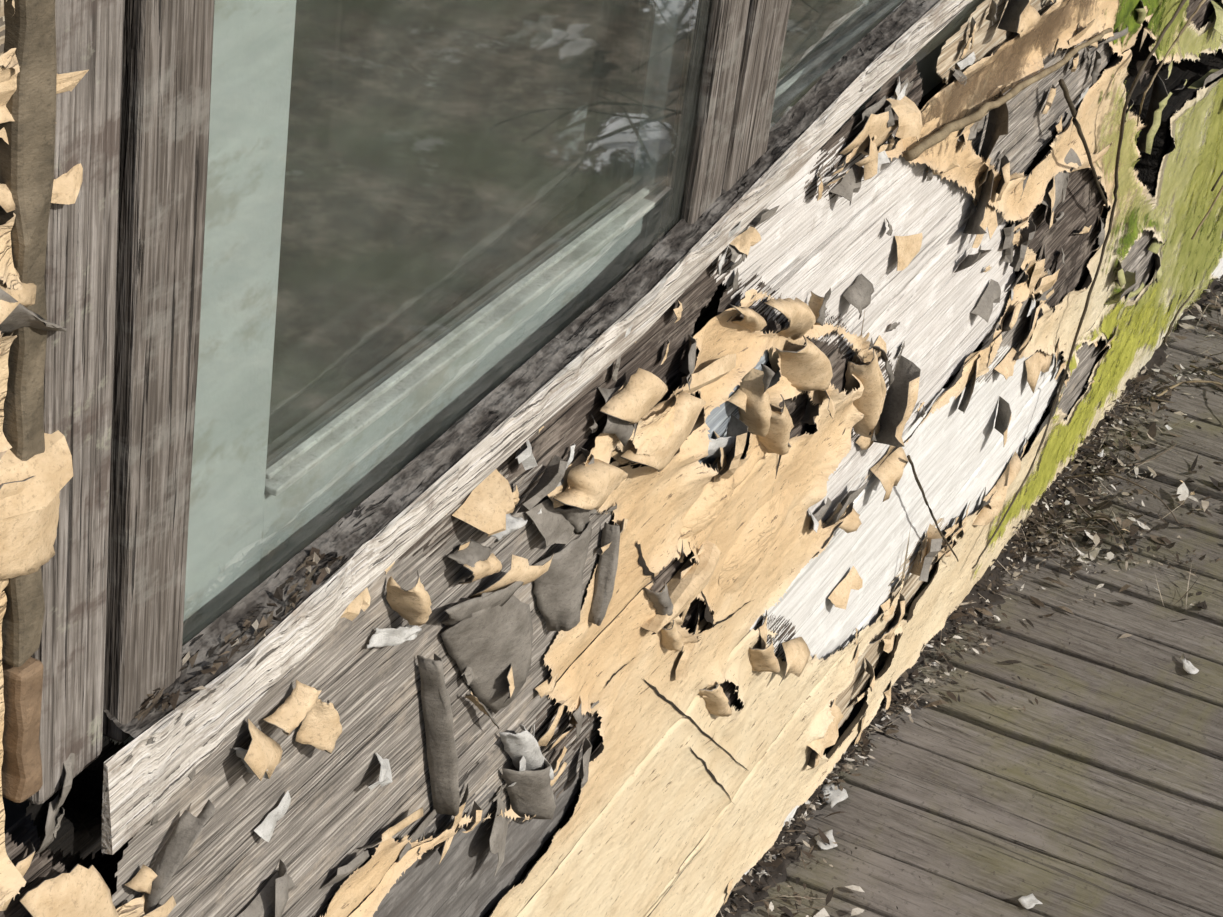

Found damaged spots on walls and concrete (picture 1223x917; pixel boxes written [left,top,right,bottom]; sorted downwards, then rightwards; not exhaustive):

peeling [0,0,20,145]
peeling [936,0,1065,86]
peeling [1137,52,1223,154]
damp [1152,0,1223,61]
peeling [51,163,83,205]
peeling [698,350,775,482]
peeling [710,19,1128,770]
damp [973,78,1223,580]
peeling [1104,230,1165,322]
peeling [0,260,736,917]
crack [636,542,656,583]
crack [606,658,746,804]